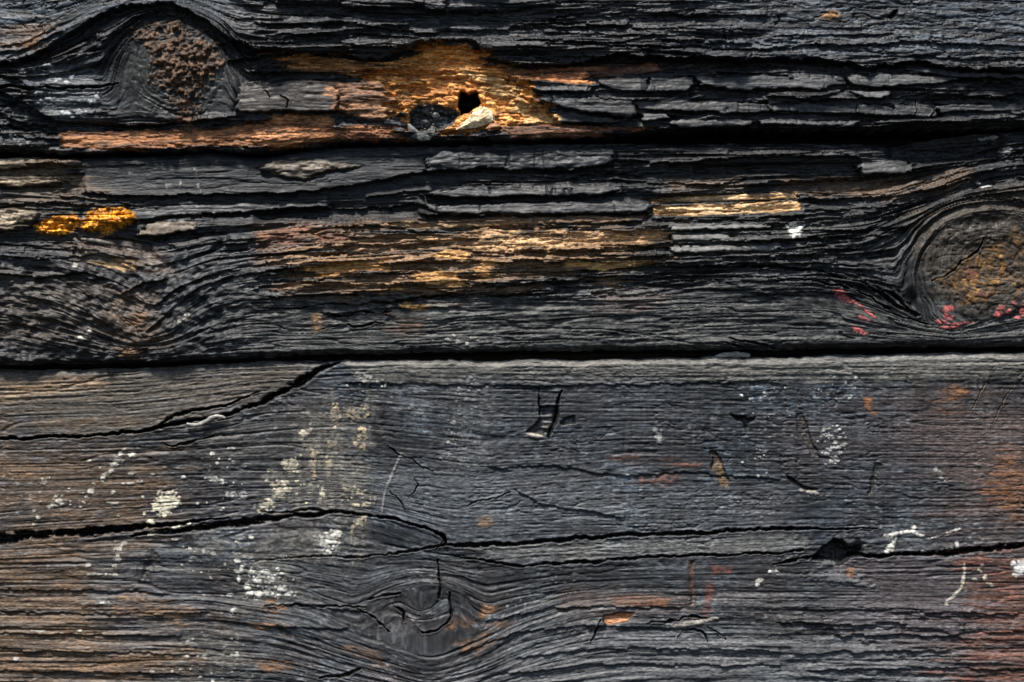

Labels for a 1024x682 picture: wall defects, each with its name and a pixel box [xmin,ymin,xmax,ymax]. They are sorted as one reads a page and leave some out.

spalling [59,41,1024,151]
peeling [382,193,805,288]
crack [0,362,340,446]
crack [0,443,1024,634]
crack [319,668,360,679]